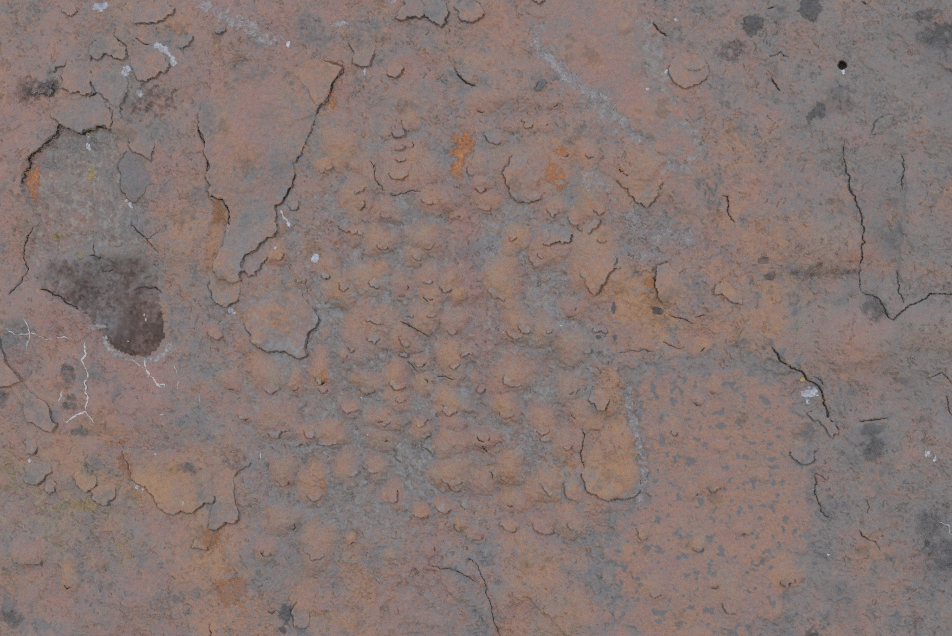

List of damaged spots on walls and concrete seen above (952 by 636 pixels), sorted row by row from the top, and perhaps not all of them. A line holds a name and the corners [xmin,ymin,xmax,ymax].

corrosion [24,166,41,206]
spalling [20,62,165,357]
peeling [198,57,342,307]
corrosion [449,124,476,178]
crack [843,141,952,321]
crack [772,348,837,427]